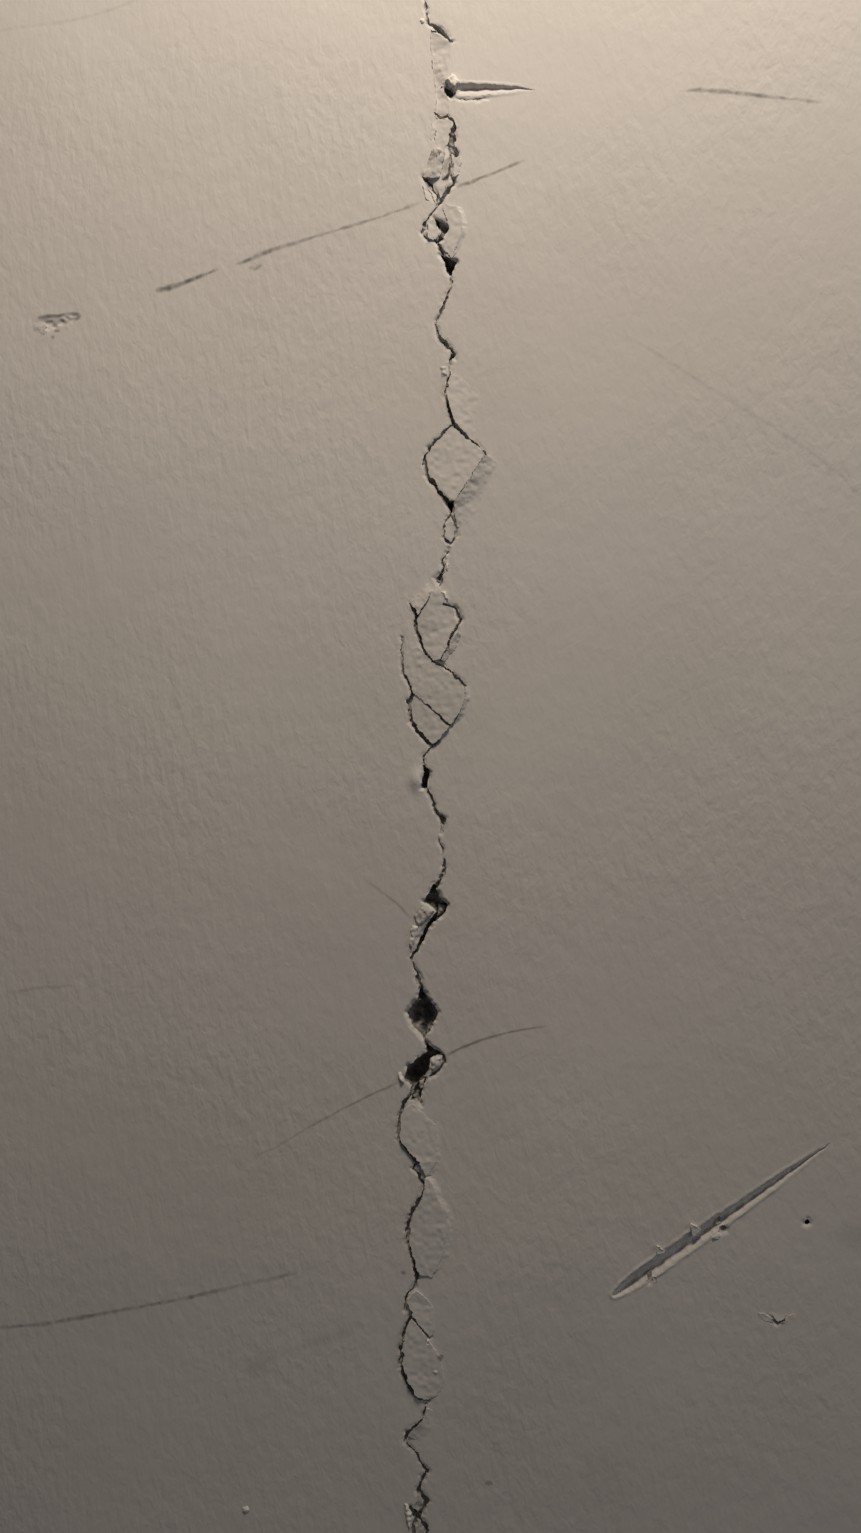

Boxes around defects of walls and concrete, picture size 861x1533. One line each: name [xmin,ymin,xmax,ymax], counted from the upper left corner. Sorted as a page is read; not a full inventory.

crack [397,0,498,1533]
spalling [612,1143,830,1297]